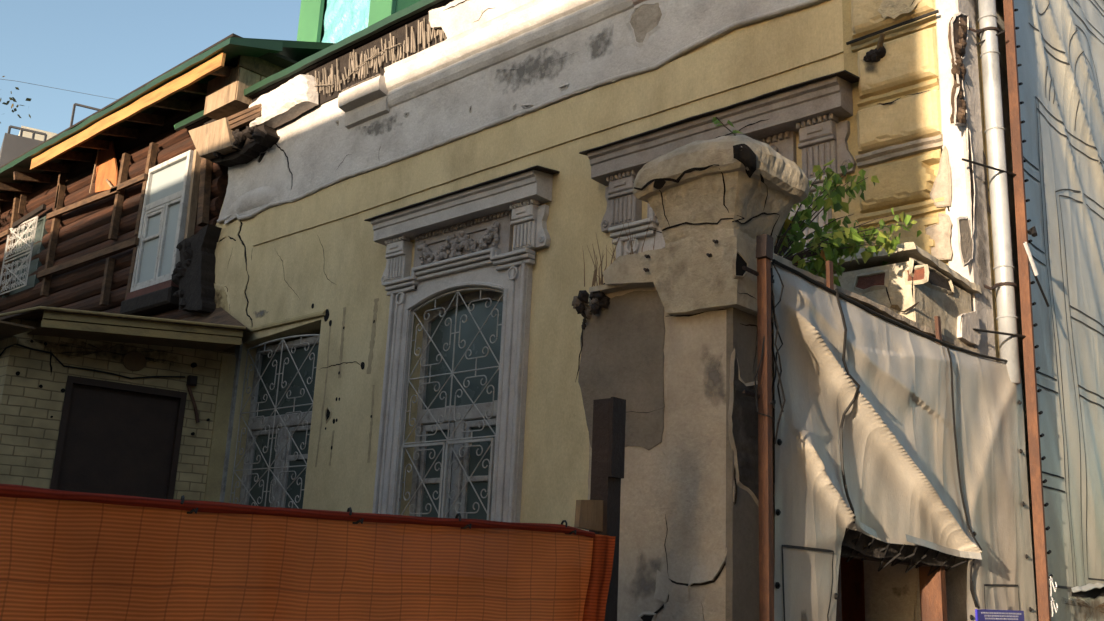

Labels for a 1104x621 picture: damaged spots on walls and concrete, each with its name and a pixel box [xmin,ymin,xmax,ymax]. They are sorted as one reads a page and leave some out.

peeling [627,0,666,47]
peeling [877,0,921,19]
crack [633,119,797,237]
crack [214,219,297,328]
crack [654,459,738,618]